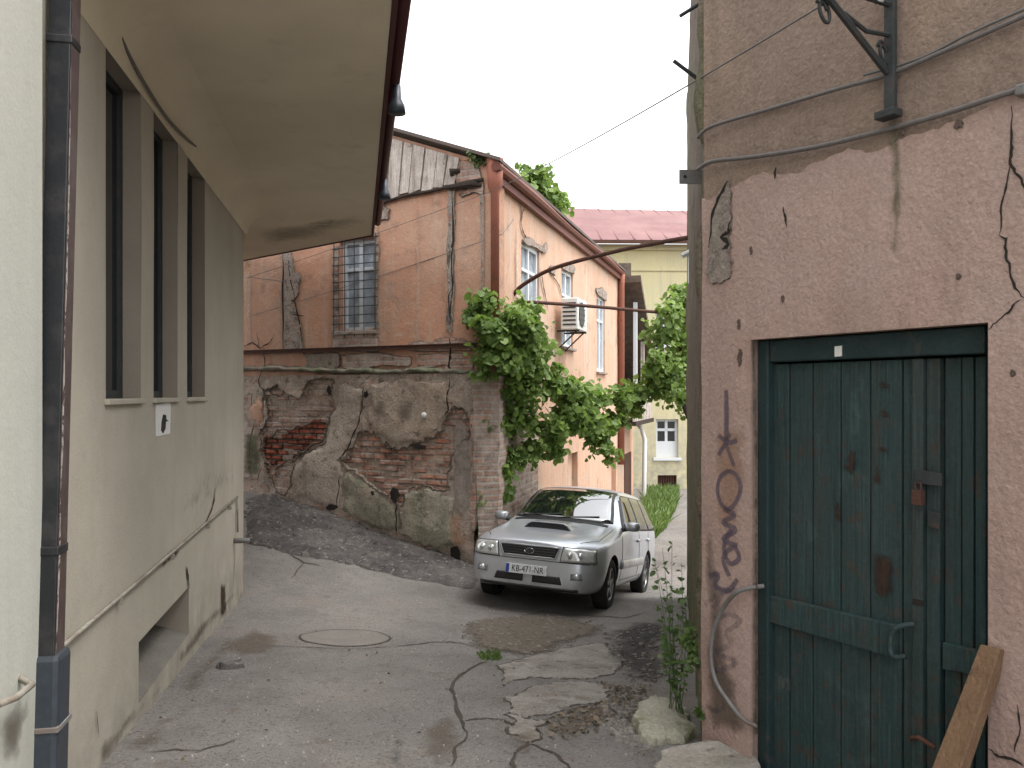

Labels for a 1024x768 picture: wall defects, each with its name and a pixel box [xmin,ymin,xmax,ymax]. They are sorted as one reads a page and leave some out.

spalling [706,180,734,285]
crack [988,106,1024,330]
spalling [244,160,485,496]
crack [444,189,465,416]
crack [336,388,369,509]
spalling [340,407,477,541]
crack [358,641,571,768]